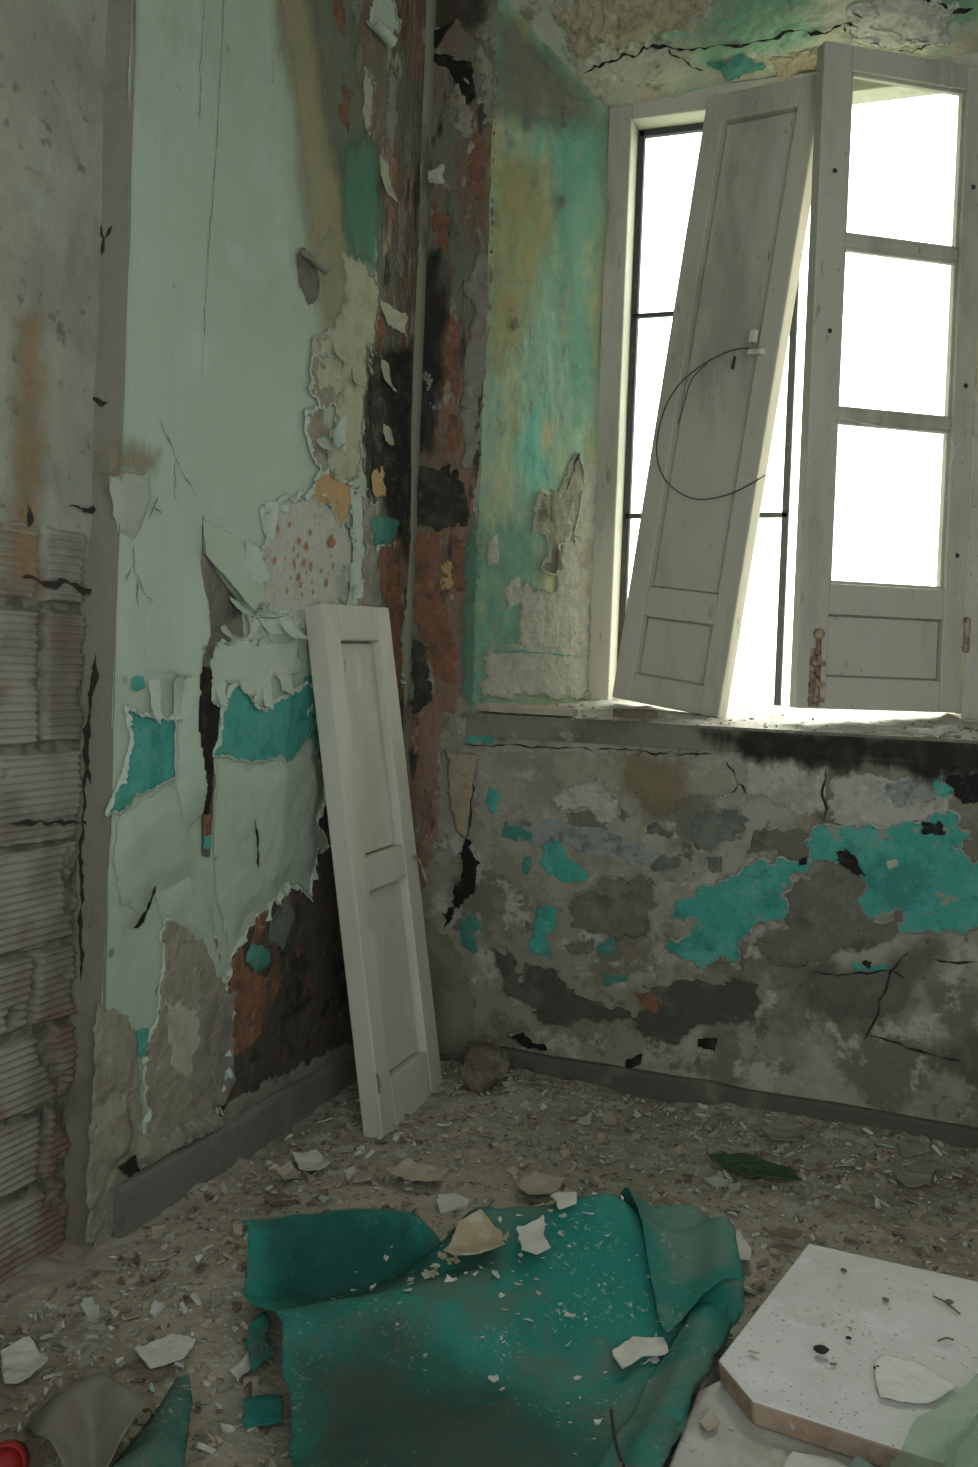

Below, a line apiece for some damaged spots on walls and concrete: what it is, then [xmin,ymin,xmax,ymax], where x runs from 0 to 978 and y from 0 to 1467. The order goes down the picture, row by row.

spalling [550,0,719,68]
crack [584,14,863,74]
spalling [768,47,818,78]
peeling [846,0,961,50]
crack [926,0,974,14]
water stain [367,249,470,562]
peeling [85,0,600,1255]
peeling [564,809,978,969]
crack [812,950,978,1061]
spalling [625,1054,642,1068]
spalling [697,1037,717,1051]